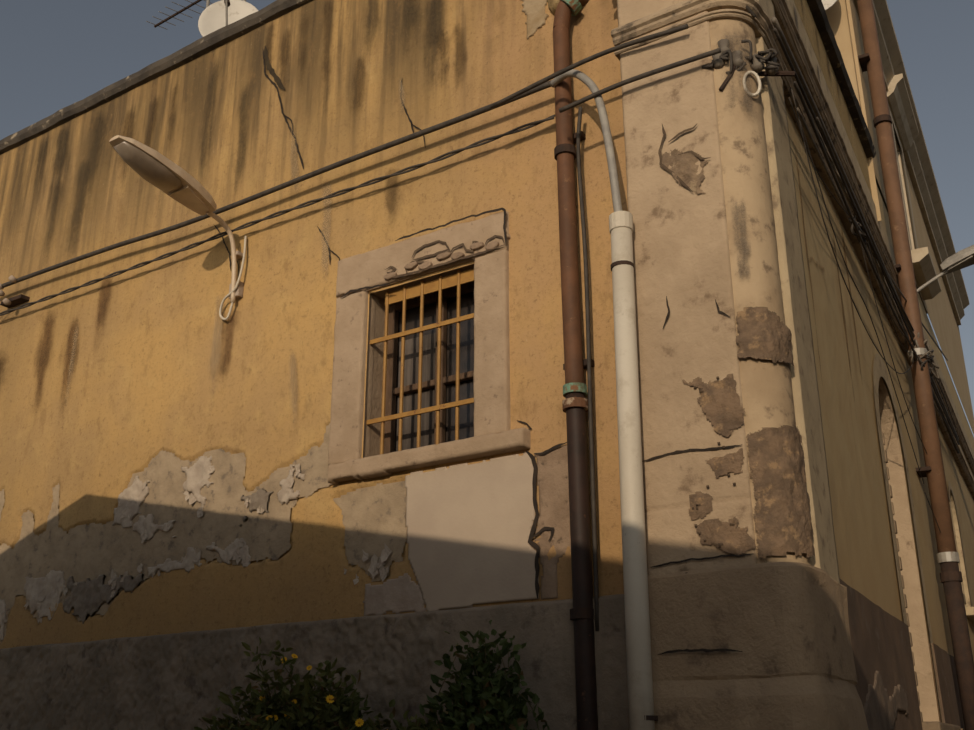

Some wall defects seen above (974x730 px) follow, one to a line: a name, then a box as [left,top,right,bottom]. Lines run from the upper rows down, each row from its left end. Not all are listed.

crack [262,46,304,169]
crack [400,80,426,148]
flaking render [658,124,711,195]
spalling [736,307,794,366]
crack [642,445,741,462]
spalling [682,374,815,559]
peeling [0,424,331,644]
flaking render [333,481,407,585]
flaking render [533,445,571,600]
crack [652,554,752,567]